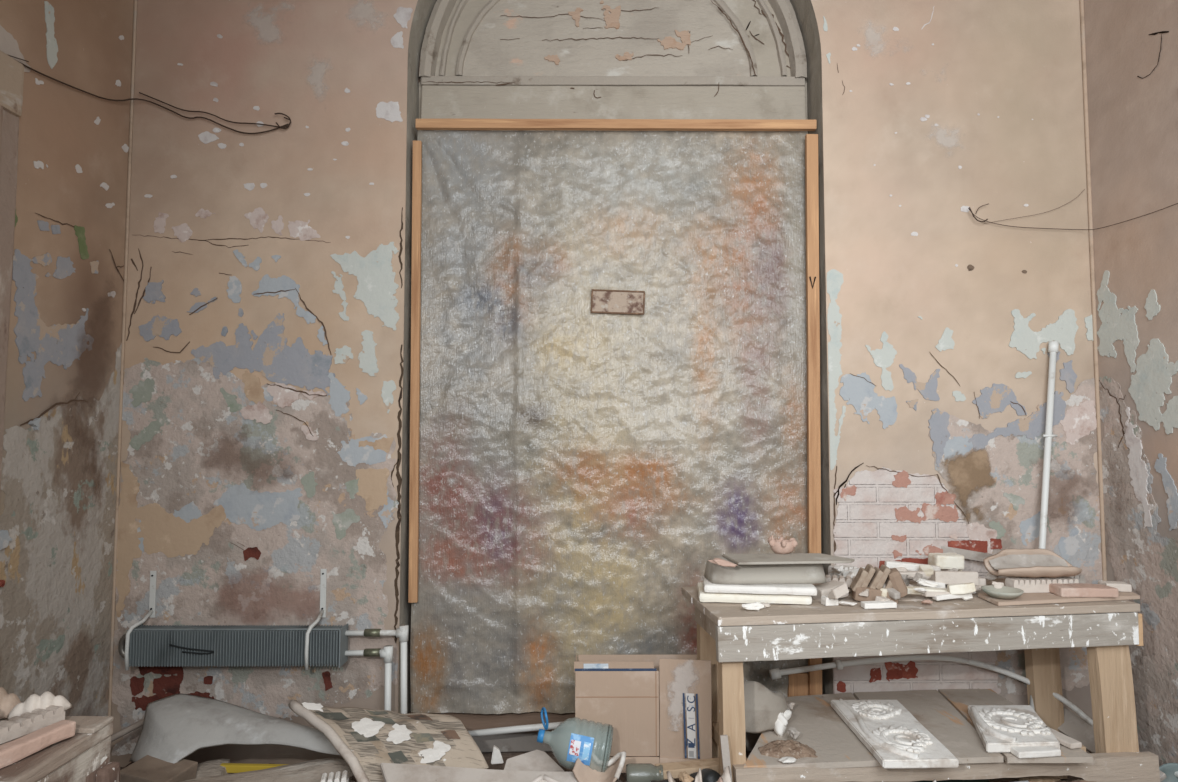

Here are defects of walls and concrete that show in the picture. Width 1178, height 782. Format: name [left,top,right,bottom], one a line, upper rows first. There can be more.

flaking render [0,25,44,85]
peeling [44,1,58,69]
crack [428,79,515,87]
crack [500,0,790,76]
peeling [198,128,244,149]
flaking render [0,207,404,756]
crack [834,463,969,524]
damp [944,449,995,521]
flaking render [827,269,1178,767]